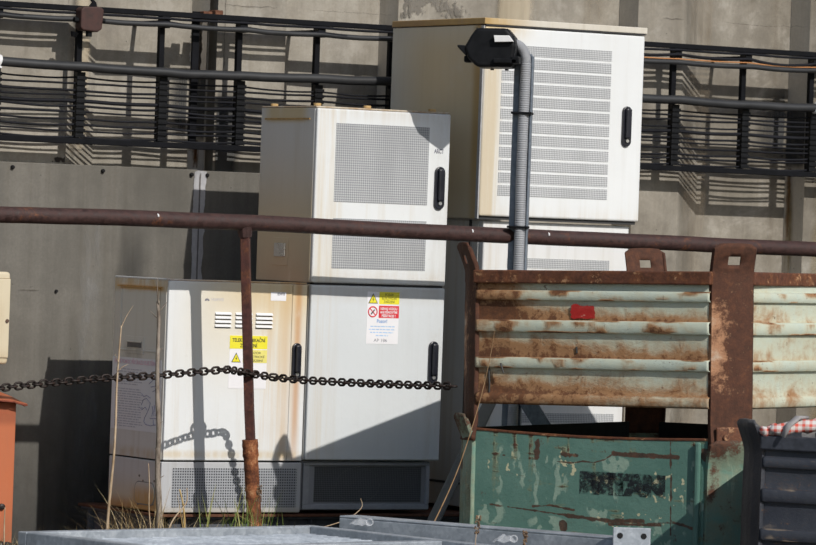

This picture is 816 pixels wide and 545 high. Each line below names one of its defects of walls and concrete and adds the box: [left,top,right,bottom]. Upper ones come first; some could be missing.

peeling [400,0,466,19]